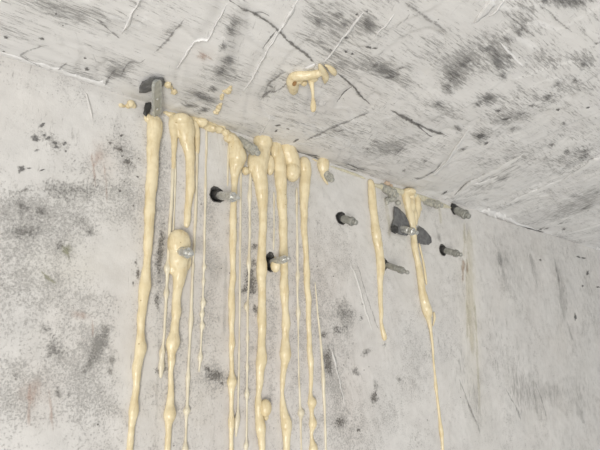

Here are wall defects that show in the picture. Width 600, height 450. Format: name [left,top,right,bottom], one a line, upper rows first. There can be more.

crack [229,0,314,62]
crack [338,74,369,103]
crack [393,111,442,137]